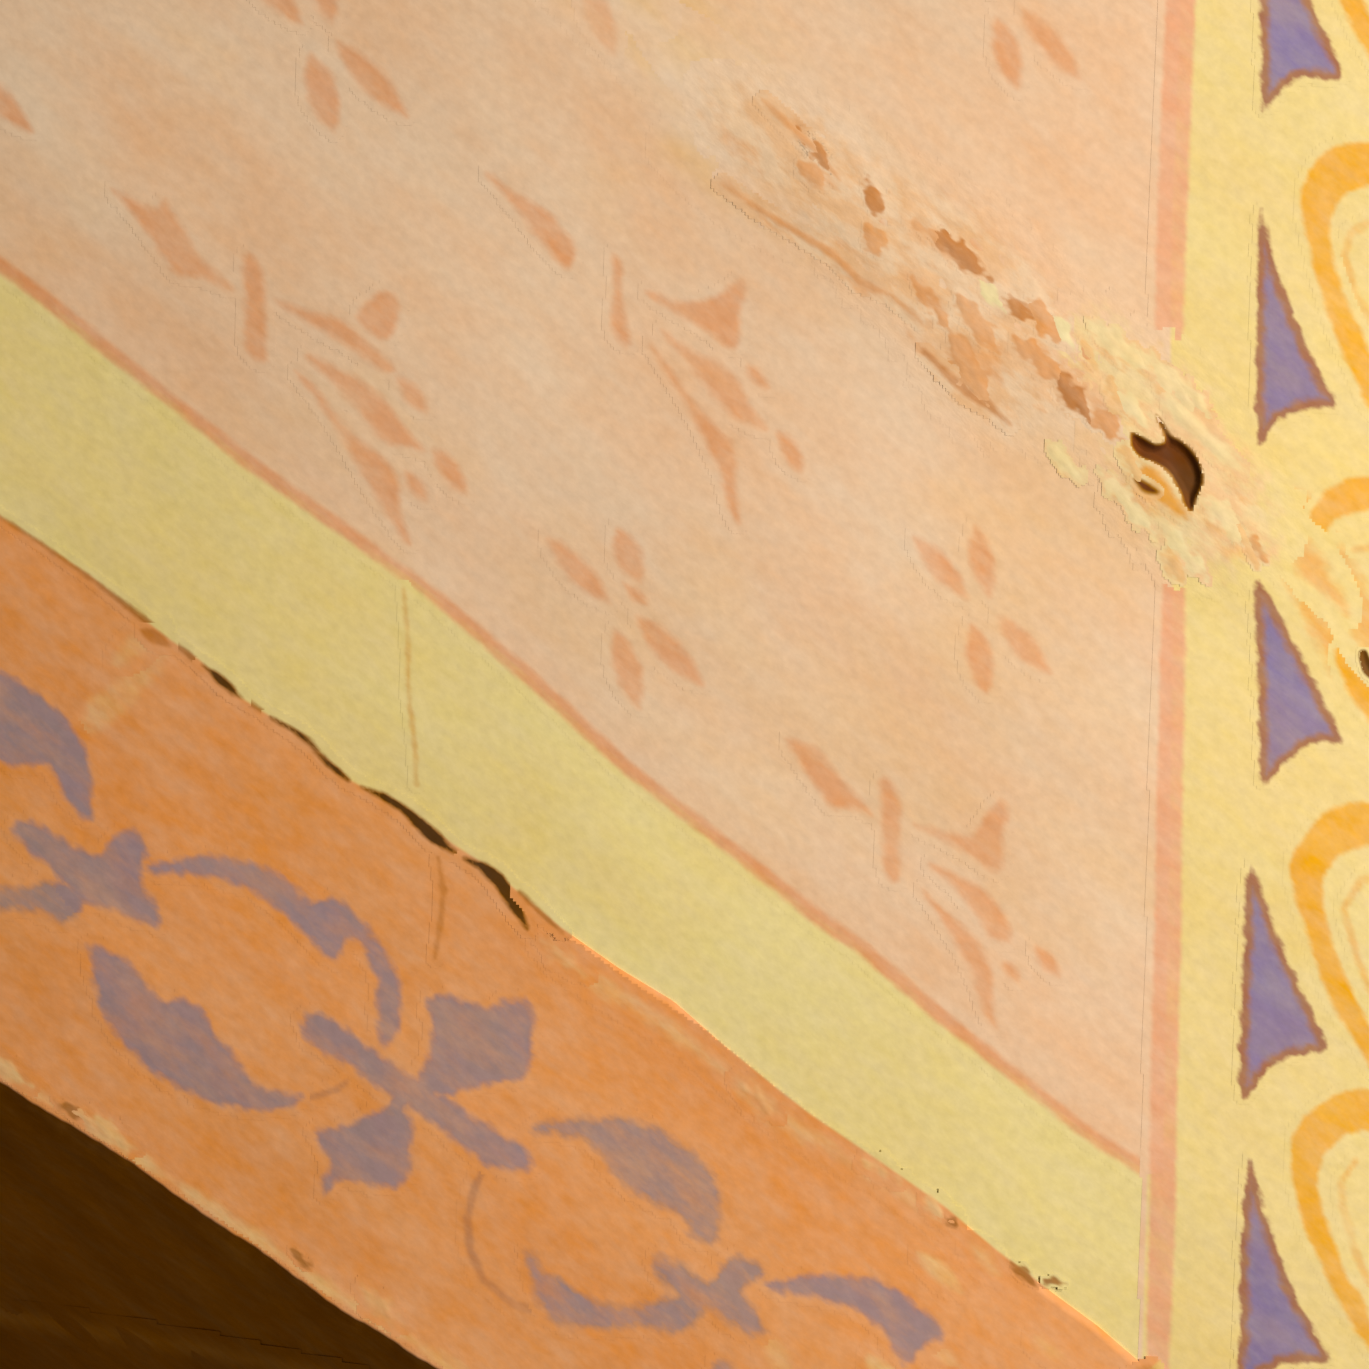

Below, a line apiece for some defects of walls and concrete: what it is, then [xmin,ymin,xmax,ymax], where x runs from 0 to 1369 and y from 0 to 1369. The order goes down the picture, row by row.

peeling [682,58,1309,602]
crack [0,506,572,968]
spalling [1355,647,1369,682]